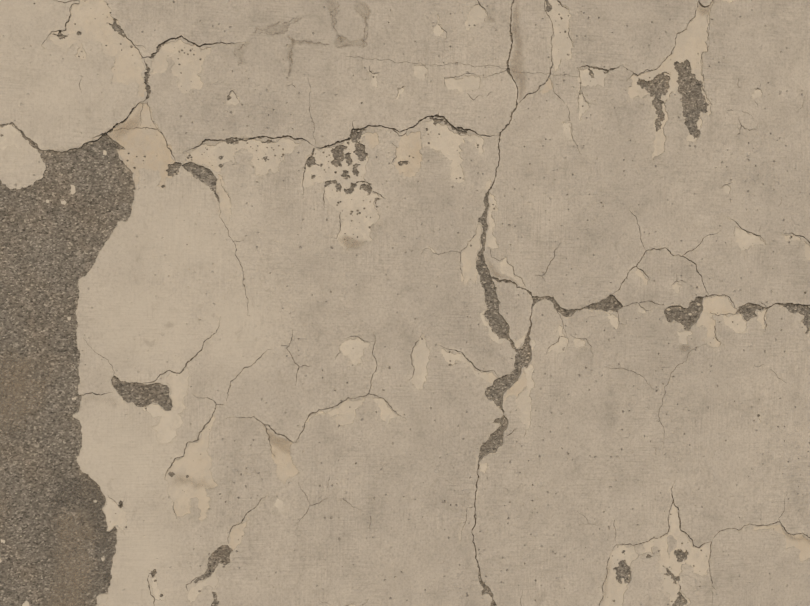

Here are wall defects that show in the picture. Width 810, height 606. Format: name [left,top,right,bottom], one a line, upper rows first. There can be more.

crack [96,0,565,194]
crack [579,54,671,83]
peeling [628,1,713,158]
peeling [301,129,383,250]
peeling [0,0,302,606]
crack [146,322,220,383]
crack [165,336,400,476]
spalling [441,180,536,473]
crack [490,250,552,339]
spalling [533,295,622,354]
peeling [664,295,767,347]
crack [698,294,810,316]